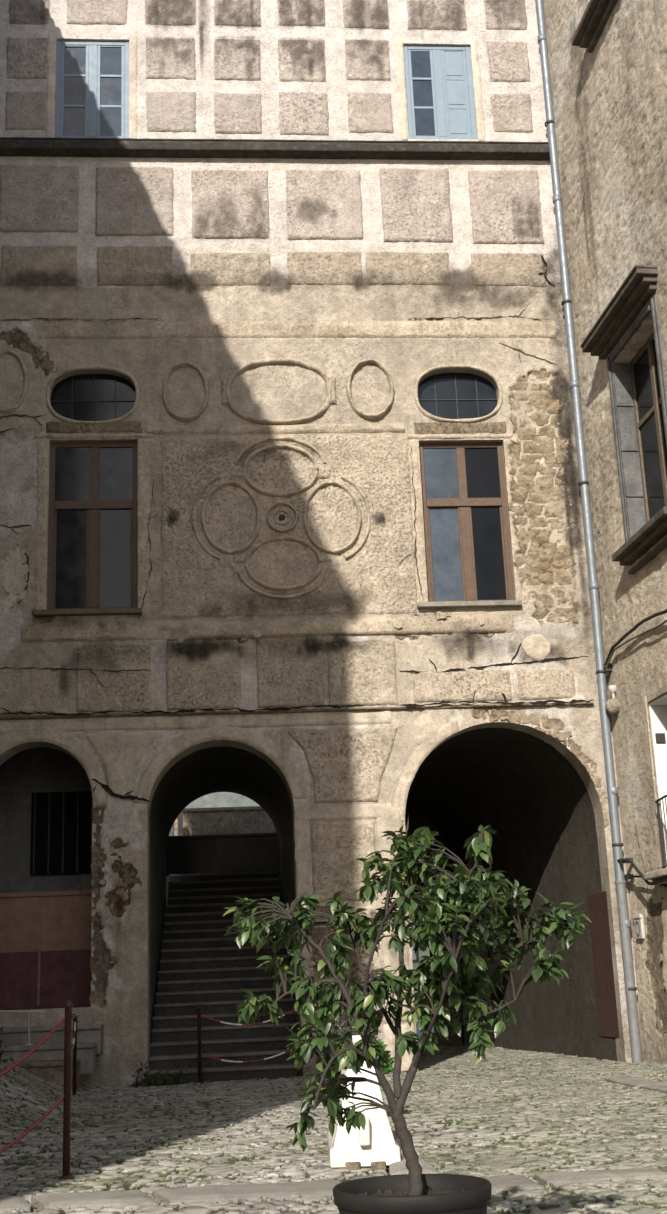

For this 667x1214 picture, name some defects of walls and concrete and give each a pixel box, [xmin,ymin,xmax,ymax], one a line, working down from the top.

damp [148,0,257,72]
damp [280,0,323,23]
damp [282,38,323,70]
damp [351,0,388,60]
spalling [0,327,58,376]
spalling [508,368,578,626]
crack [0,642,594,716]
spalling [89,798,142,1008]
spalling [307,904,381,1059]